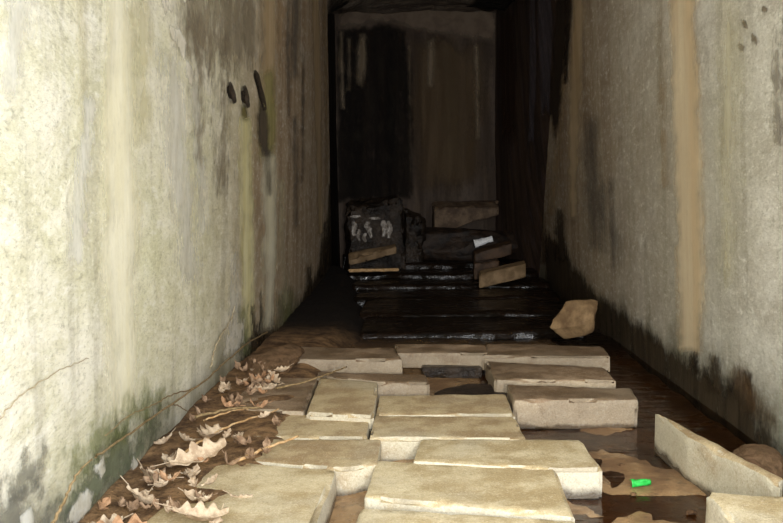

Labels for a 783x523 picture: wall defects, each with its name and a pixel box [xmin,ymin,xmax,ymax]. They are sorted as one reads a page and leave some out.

leakage [165,0,262,280]
peeling [771,50,783,144]
leakage [540,209,777,449]
leakage [0,446,56,523]